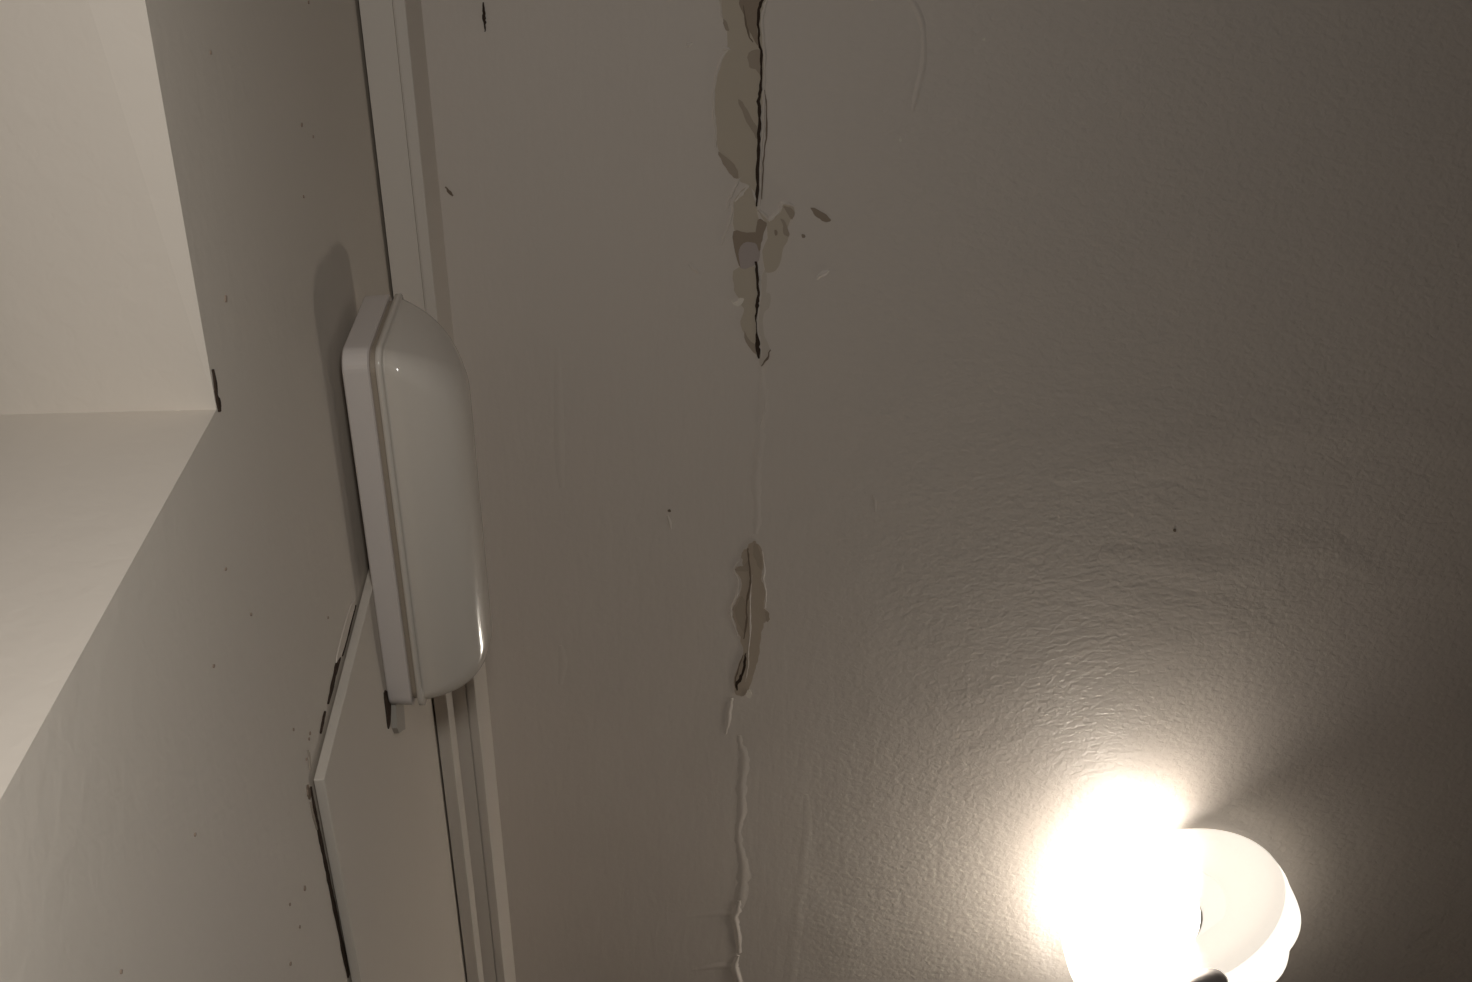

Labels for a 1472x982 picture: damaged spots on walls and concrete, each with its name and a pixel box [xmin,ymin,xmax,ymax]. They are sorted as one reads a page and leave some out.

crack [743,0,768,206]
peeling [715,0,831,366]
crack [755,261,771,366]
crack [320,605,356,734]
crack [735,548,752,691]
spalling [732,541,770,697]
crack [310,786,350,978]